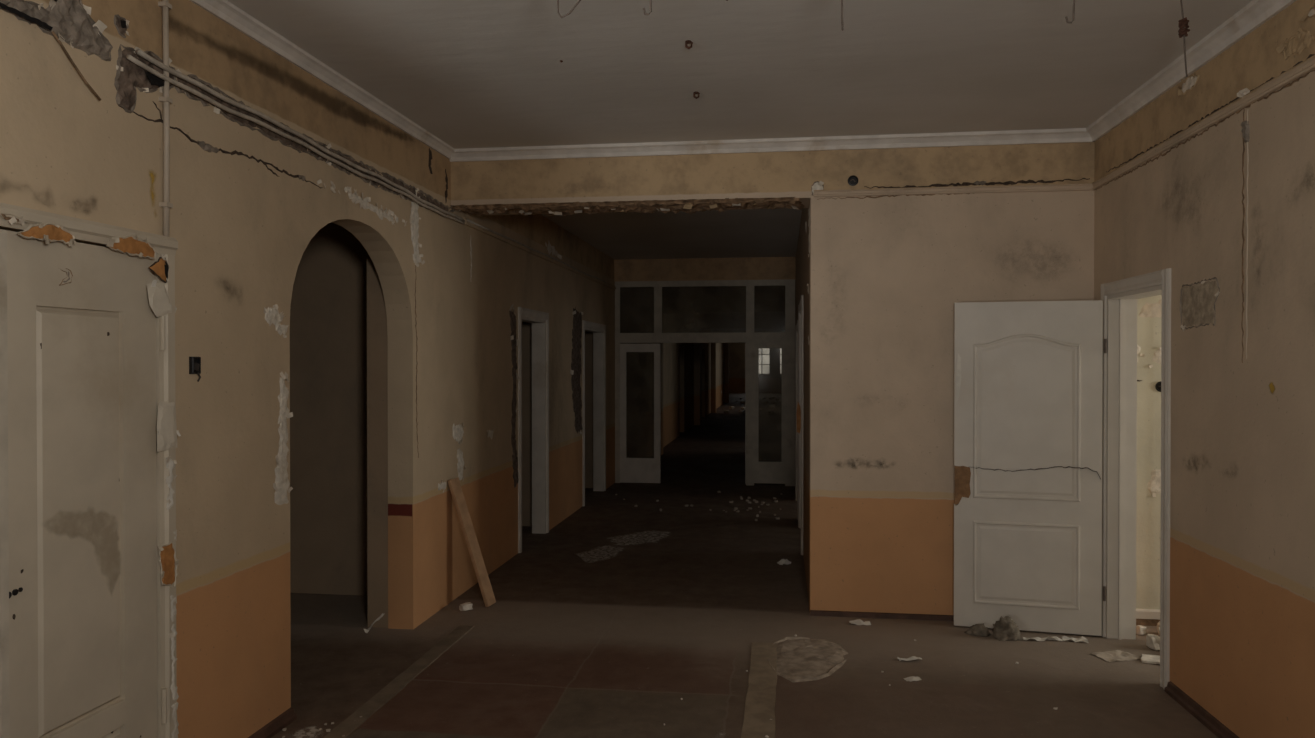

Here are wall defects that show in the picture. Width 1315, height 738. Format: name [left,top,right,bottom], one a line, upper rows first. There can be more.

crack [118,102,323,188]
flaking render [0,0,824,267]
crack [817,54,1315,363]
peeling [106,233,169,283]
crack [973,466,1101,479]